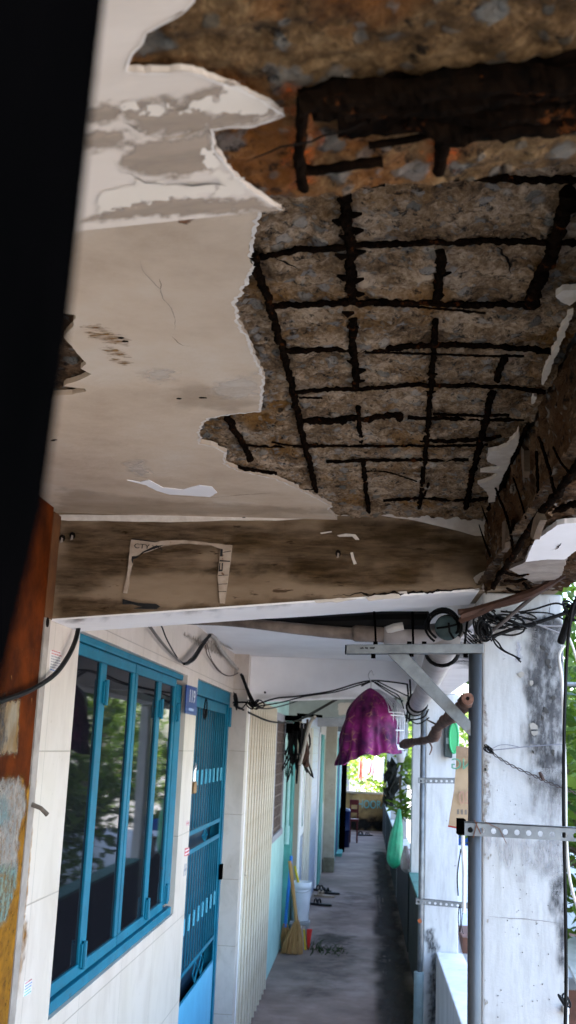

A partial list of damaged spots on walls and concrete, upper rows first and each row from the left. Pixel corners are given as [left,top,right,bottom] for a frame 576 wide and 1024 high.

spalling [525,48,576,67]
rust [283,85,323,188]
spalling [337,115,417,140]
peeling [85,0,333,510]
water stain [56,522,461,622]
water stain [494,616,564,820]
water stain [552,878,564,965]